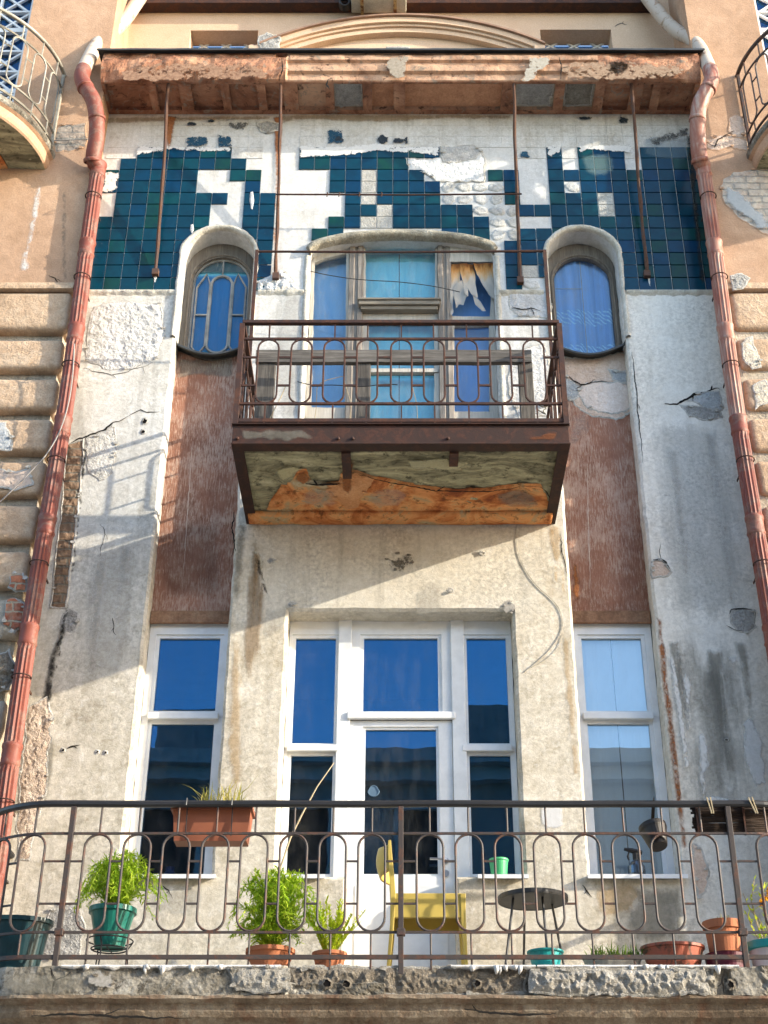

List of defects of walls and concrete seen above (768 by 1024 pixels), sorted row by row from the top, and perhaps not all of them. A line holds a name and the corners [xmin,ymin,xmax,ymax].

peeling [122,63,266,81]
peeling [103,172,119,192]
peeling [136,119,279,155]
flaking render [299,129,487,183]
crack [71,409,149,443]
flaking render [564,352,630,420]
crack [632,357,643,456]
crack [665,386,719,405]
flaking render [49,426,119,610]
corrosion [658,620,686,845]
water stain [671,644,746,800]
flaking render [15,696,55,862]